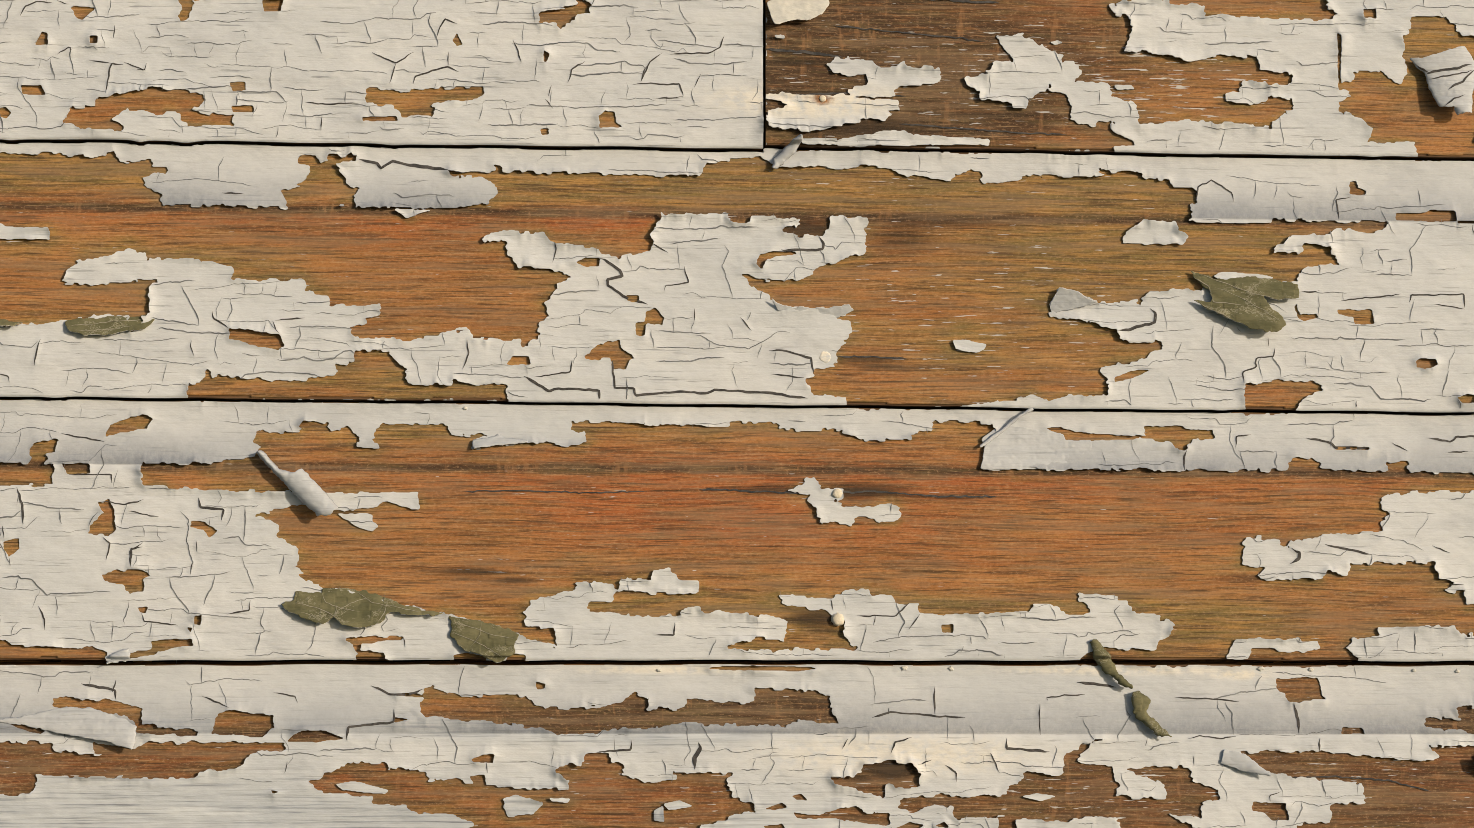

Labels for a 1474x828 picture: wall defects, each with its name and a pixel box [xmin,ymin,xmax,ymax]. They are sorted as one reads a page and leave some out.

peeling [0,0,1474,413]
crack [0,0,1474,470]
peeling [0,439,90,487]
peeling [106,414,153,437]
peeling [88,499,116,536]
crack [0,211,1474,828]
peeling [0,615,202,664]
peeling [102,569,150,613]
peeling [140,408,1474,737]
peeling [0,696,343,796]
peeling [309,739,1220,828]
peeling [1221,705,1474,828]